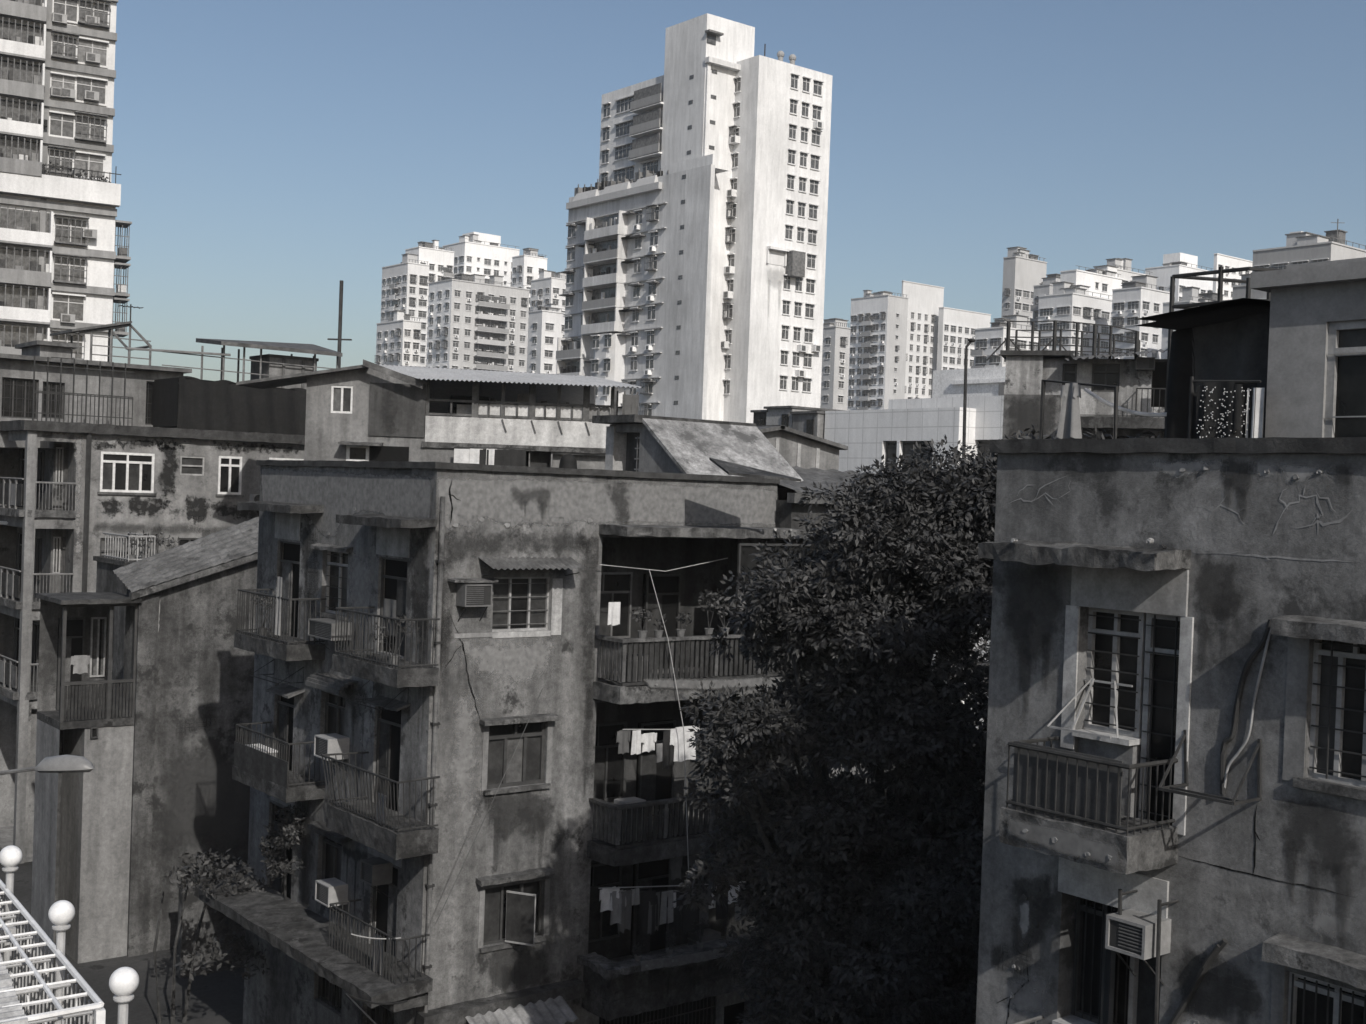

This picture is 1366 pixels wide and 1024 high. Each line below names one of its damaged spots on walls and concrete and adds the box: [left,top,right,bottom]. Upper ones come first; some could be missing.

damp [514,490,549,512]
crack [1010,476,1071,503]
crack [1193,485,1352,562]
damp [1197,555,1240,619]
damp [1283,800,1357,875]
damp [1179,937,1261,1016]